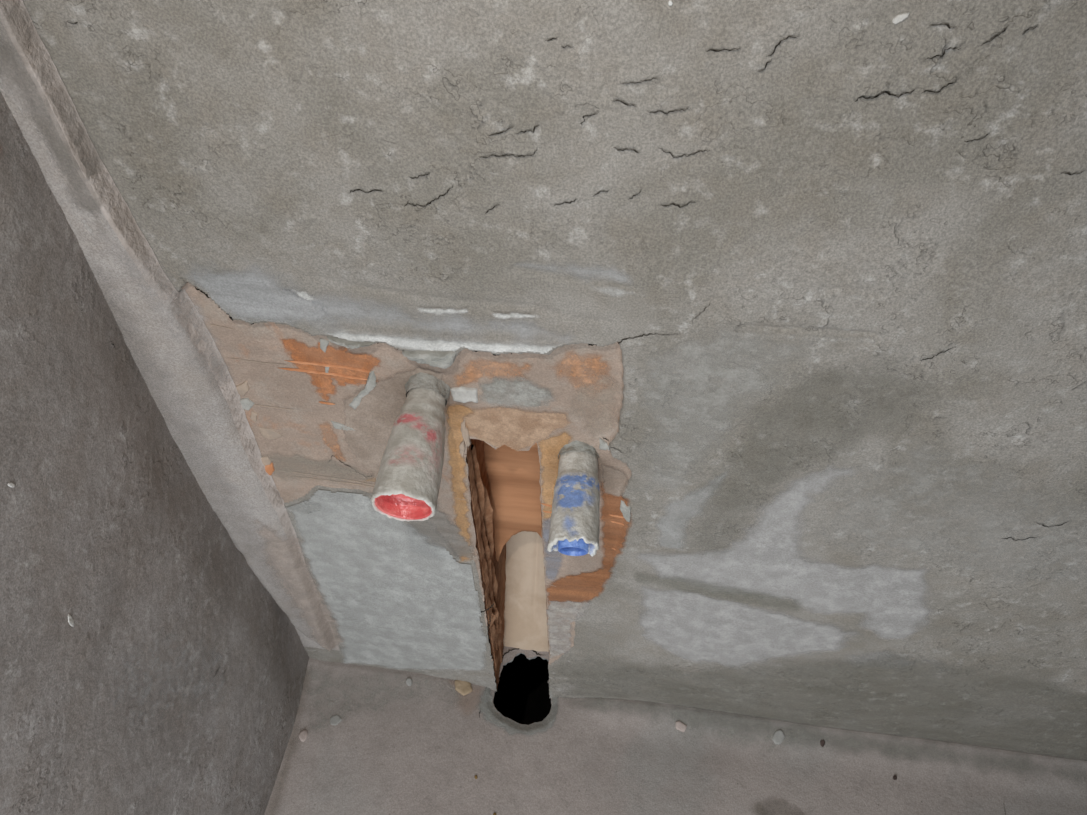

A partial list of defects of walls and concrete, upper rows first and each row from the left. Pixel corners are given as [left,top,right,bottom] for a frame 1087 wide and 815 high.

crack [929,24,1037,59]
crack [581,78,691,124]
crack [852,82,955,104]
crack [480,126,537,158]
crack [613,147,710,158]
crack [404,173,453,207]
flaking render [0,0,632,665]